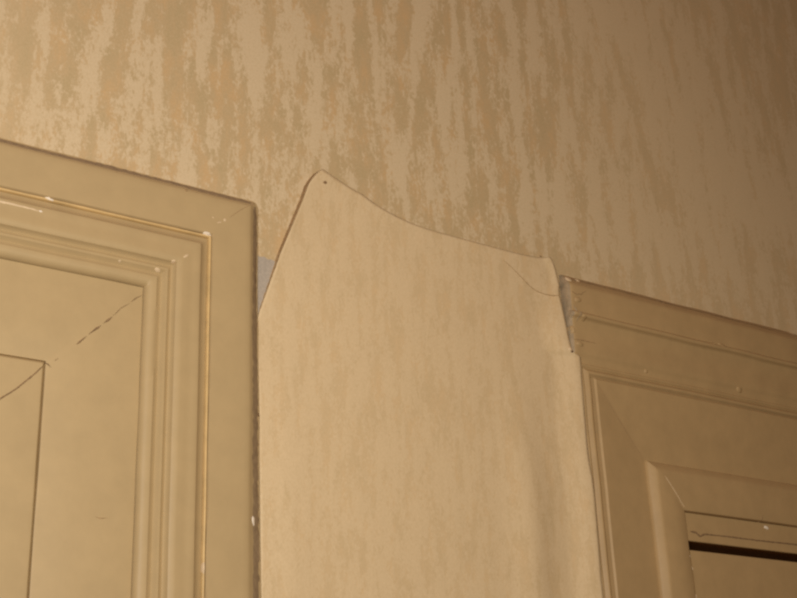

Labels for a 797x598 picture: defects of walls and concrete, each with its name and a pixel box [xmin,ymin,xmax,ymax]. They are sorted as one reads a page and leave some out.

flaking render [257,256,275,313]